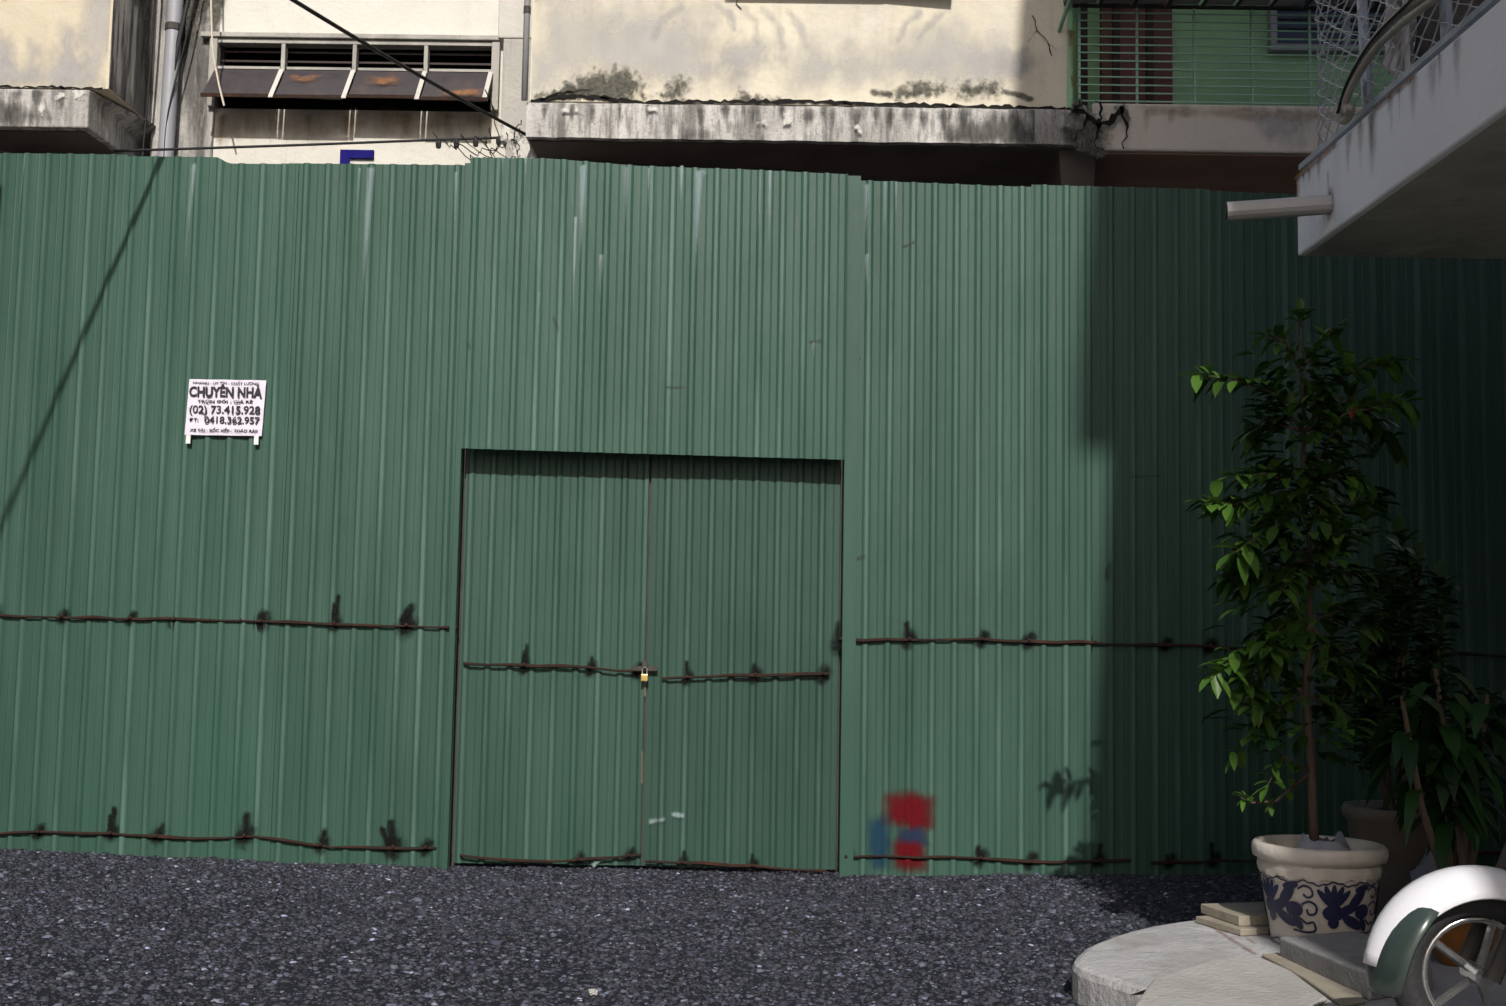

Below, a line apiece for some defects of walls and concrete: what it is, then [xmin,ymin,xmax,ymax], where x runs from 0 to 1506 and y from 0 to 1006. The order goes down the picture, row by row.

damp [0,0,111,125]
damp [535,10,709,136]
damp [722,92,784,119]
damp [853,35,1035,142]